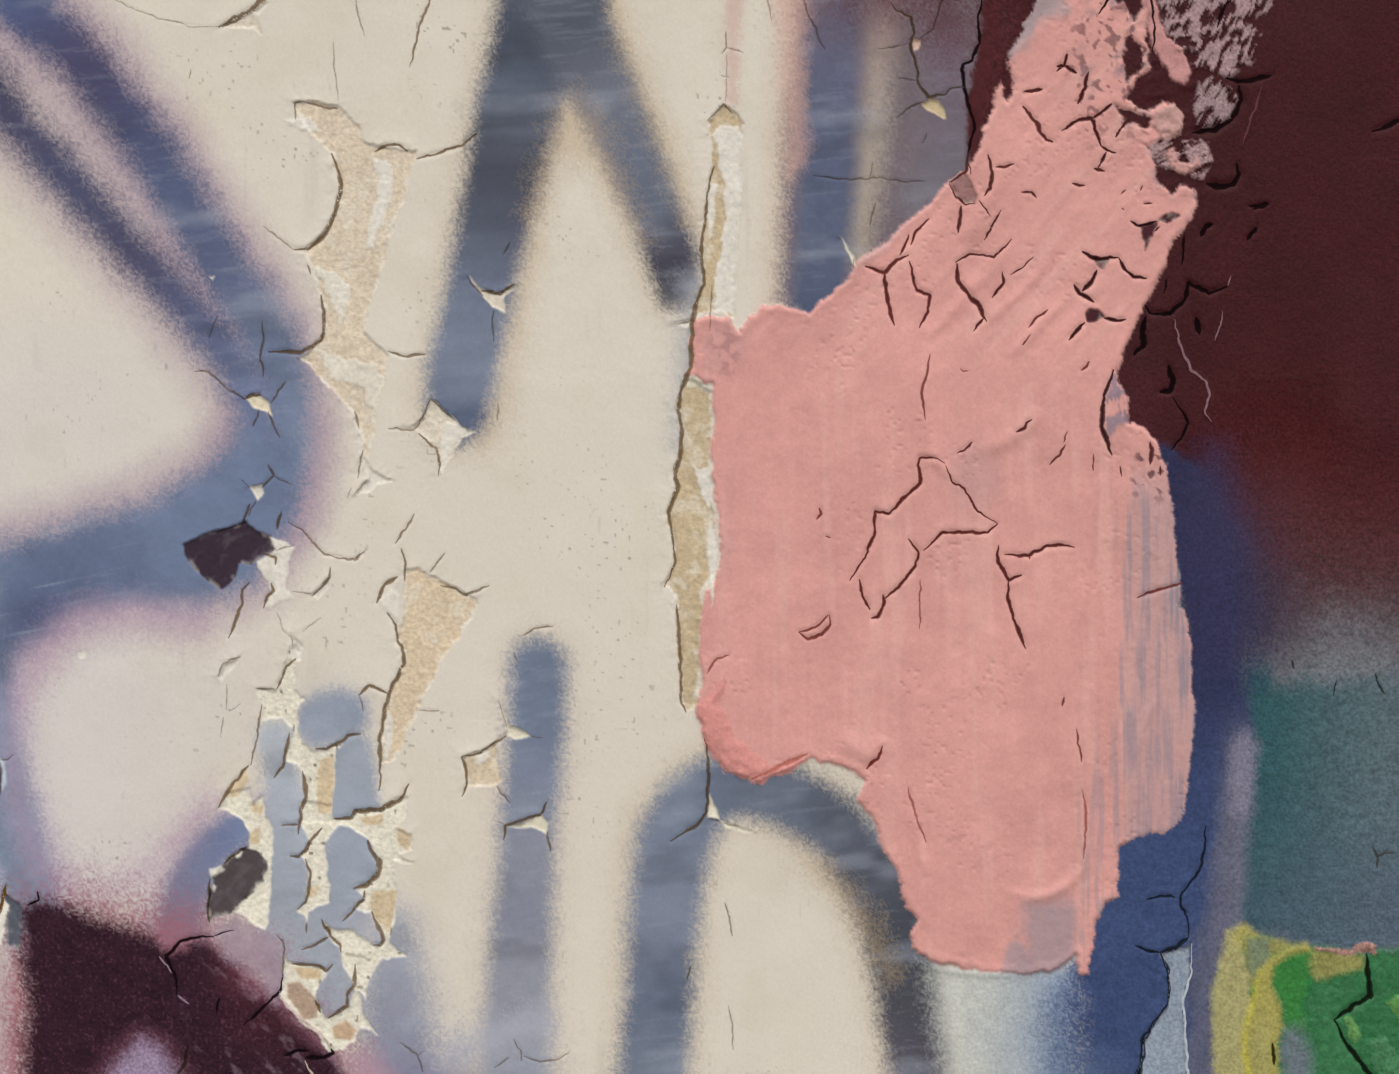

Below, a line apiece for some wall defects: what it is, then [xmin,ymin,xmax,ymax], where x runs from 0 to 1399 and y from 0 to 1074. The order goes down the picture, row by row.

crack [960,0,1037,198]
crack [1022,54,1152,210]
peeling [194,370,286,438]
peeling [265,98,477,498]
peeling [468,274,515,342]
peeling [662,103,747,714]
crack [865,218,1033,420]
crack [1049,223,1228,476]
crack [798,615,831,640]
crack [850,442,1075,649]
peeling [181,465,490,1053]
peeling [670,738,758,842]